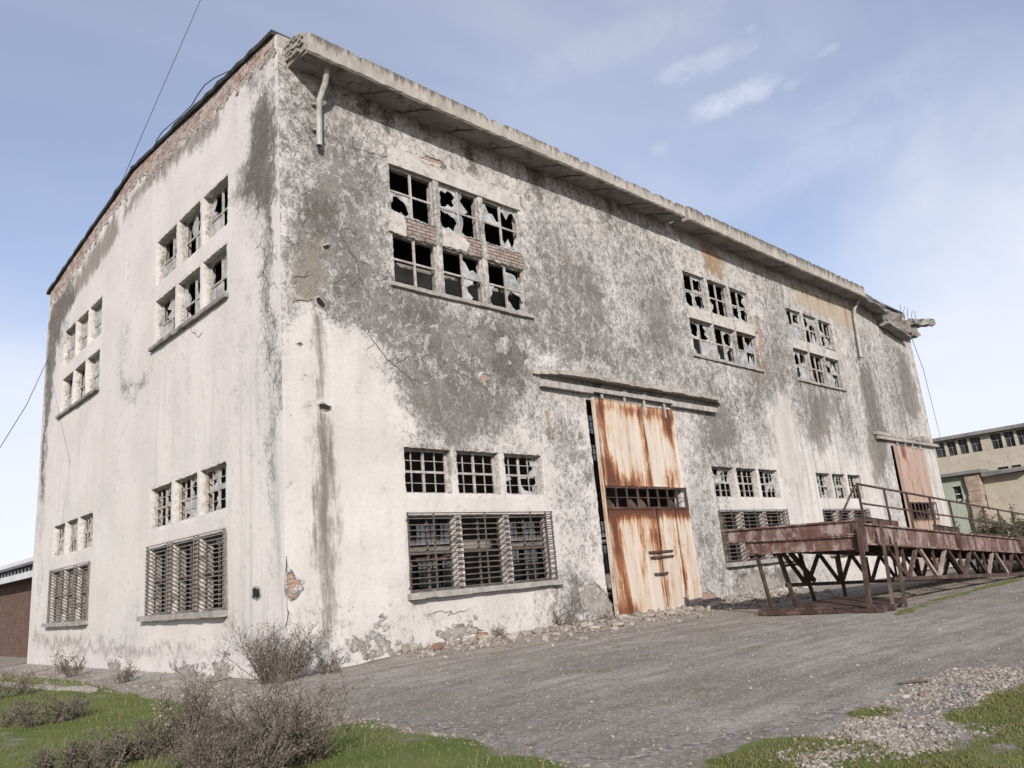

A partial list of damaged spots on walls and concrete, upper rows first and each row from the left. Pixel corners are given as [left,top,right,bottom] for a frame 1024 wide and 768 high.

damp [243,92,278,222]
damp [464,147,477,173]
damp [526,166,545,200]
damp [287,200,339,306]
crack [329,222,372,290]
flaking render [404,217,525,270]
damp [490,329,533,390]
damp [899,352,919,416]
damp [859,369,886,484]
damp [315,430,333,649]
flaking render [284,569,305,602]
flaking render [344,613,423,662]